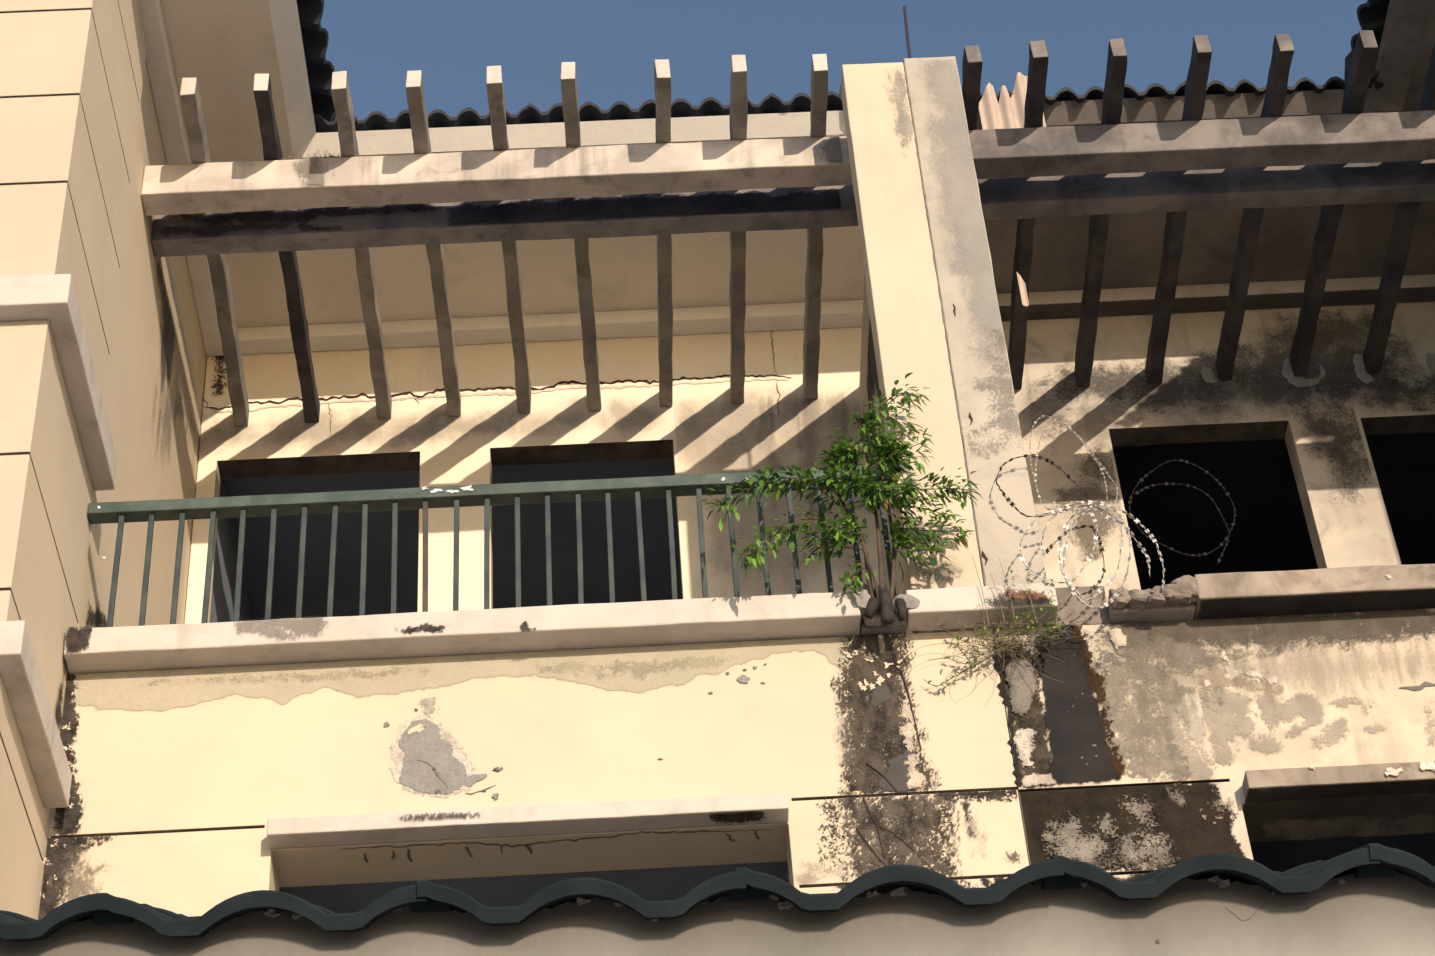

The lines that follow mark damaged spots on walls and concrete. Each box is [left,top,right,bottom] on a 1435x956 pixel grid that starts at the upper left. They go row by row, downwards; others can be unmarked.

water stain [886,71,913,147]
water stain [929,59,1081,458]
water stain [156,260,195,452]
water stain [209,356,228,396]
crack [202,331,791,434]
water stain [1035,287,1435,498]
water stain [1056,444,1123,561]
peeling [1204,649,1280,687]
peeling [383,696,503,821]
water stain [0,574,1435,956]
peeling [1419,759,1435,771]
crack [341,829,763,862]